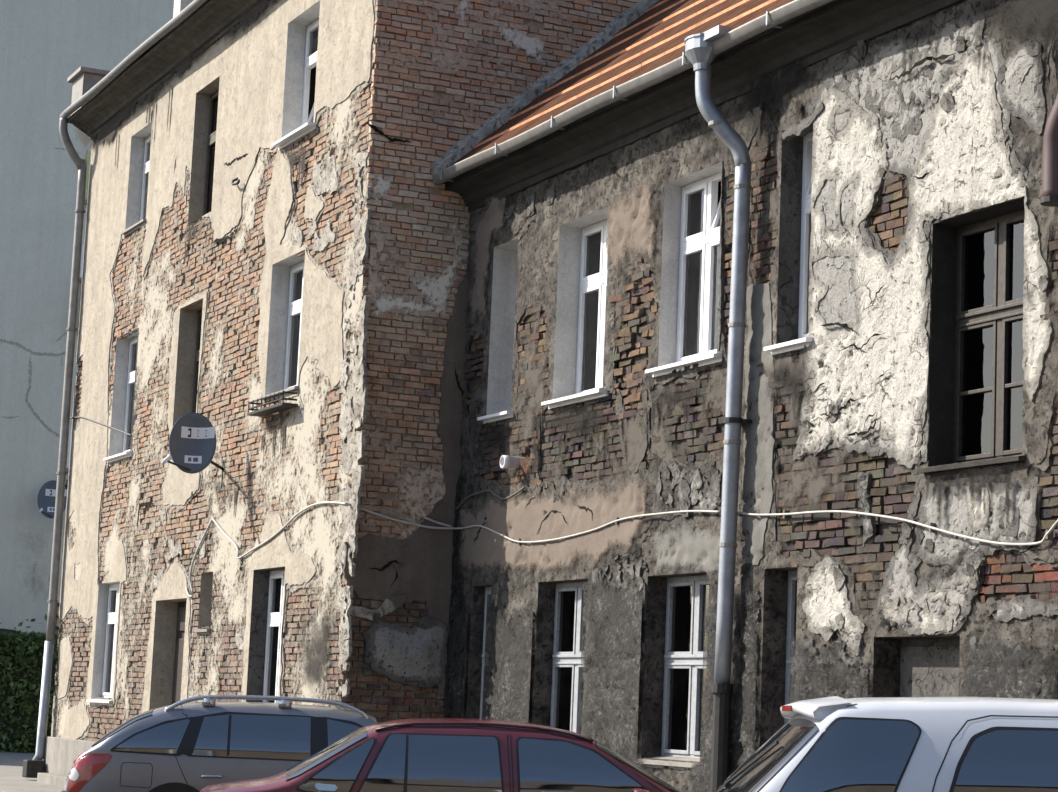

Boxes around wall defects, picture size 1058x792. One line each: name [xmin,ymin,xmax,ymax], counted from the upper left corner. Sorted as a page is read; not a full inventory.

crack [889,53,955,83]
crack [1014,55,1034,88]
crack [366,122,411,143]
crack [821,322,884,356]
flaking render [747,2,1058,699]
crack [0,328,78,438]
spalling [51,0,735,741]
crack [810,370,888,438]
crack [526,497,593,533]
crack [369,560,403,587]